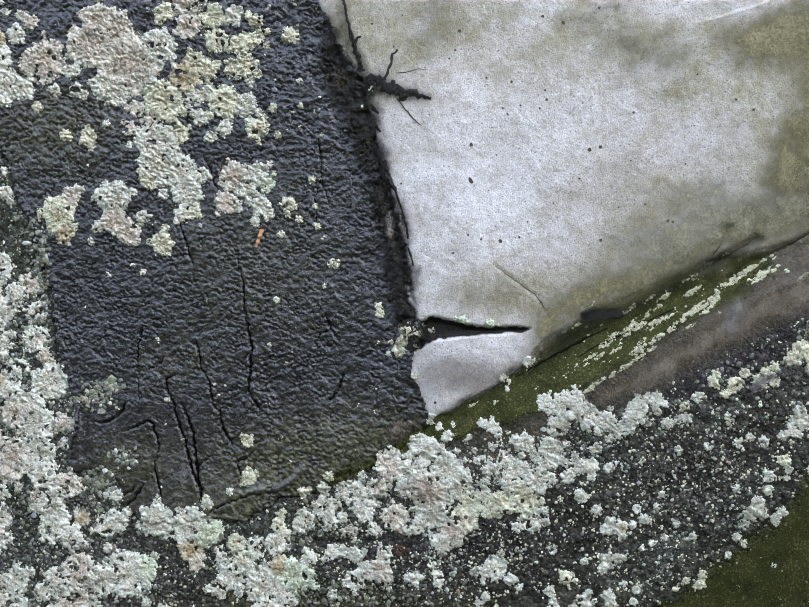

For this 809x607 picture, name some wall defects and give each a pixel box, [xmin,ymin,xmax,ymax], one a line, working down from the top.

crack [711,233,809,260]
crack [226,250,260,410]
crack [418,316,530,349]
crack [516,308,675,377]
damp [581,308,623,321]
damp [596,273,809,404]
crack [97,329,261,514]